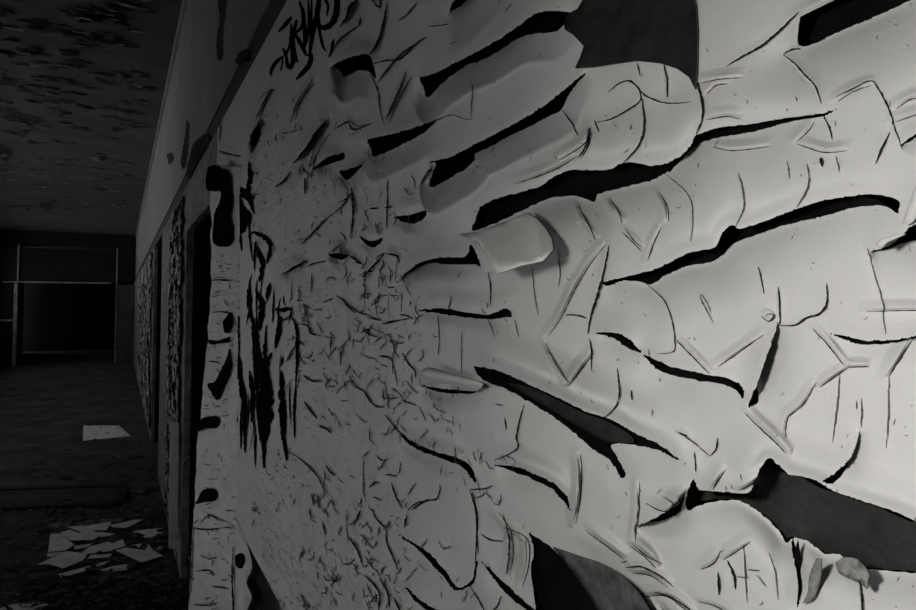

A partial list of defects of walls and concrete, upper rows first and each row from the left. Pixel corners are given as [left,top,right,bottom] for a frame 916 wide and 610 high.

peeling [797,0,909,47]
peeling [166,119,212,179]
peeling [294,0,832,283]
crack [554,63,729,165]
crack [666,158,699,241]
peeling [601,116,916,285]
peeling [207,313,233,400]
crack [187,89,531,610]
crack [558,246,609,372]
crack [581,282,695,418]
peeling [396,286,916,610]
crack [676,431,718,472]